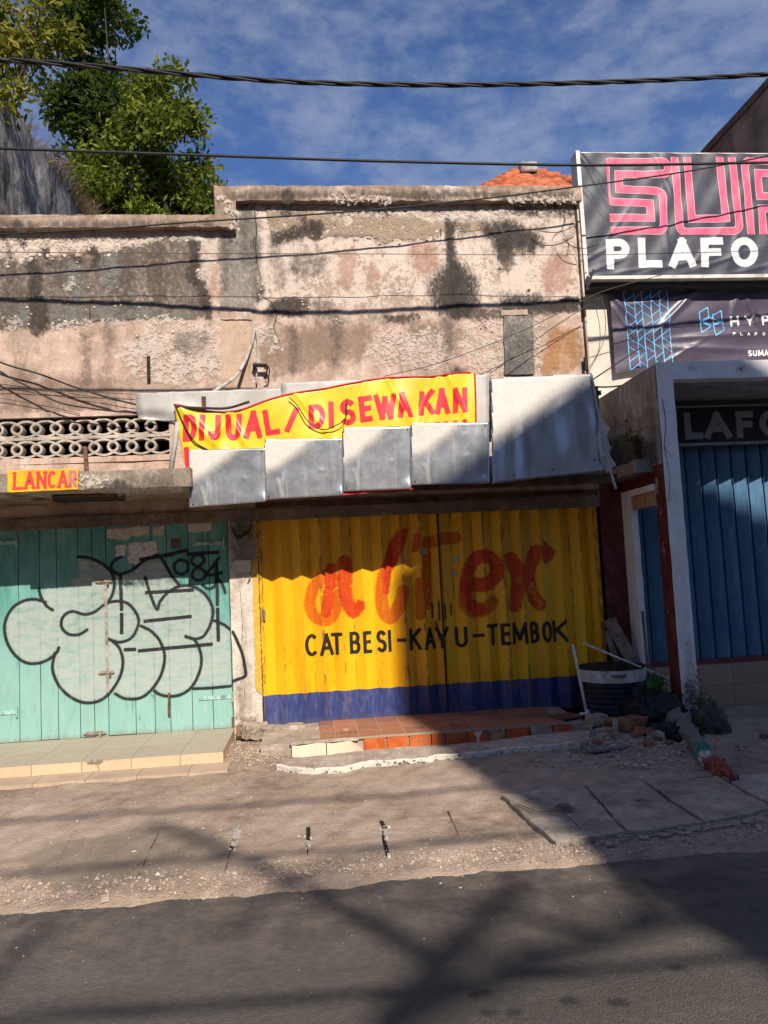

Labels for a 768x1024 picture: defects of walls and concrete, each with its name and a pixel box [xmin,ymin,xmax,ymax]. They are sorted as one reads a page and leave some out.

peeling [217,195,239,230]
flaking render [266,193,577,273]
water stain [0,188,580,374]